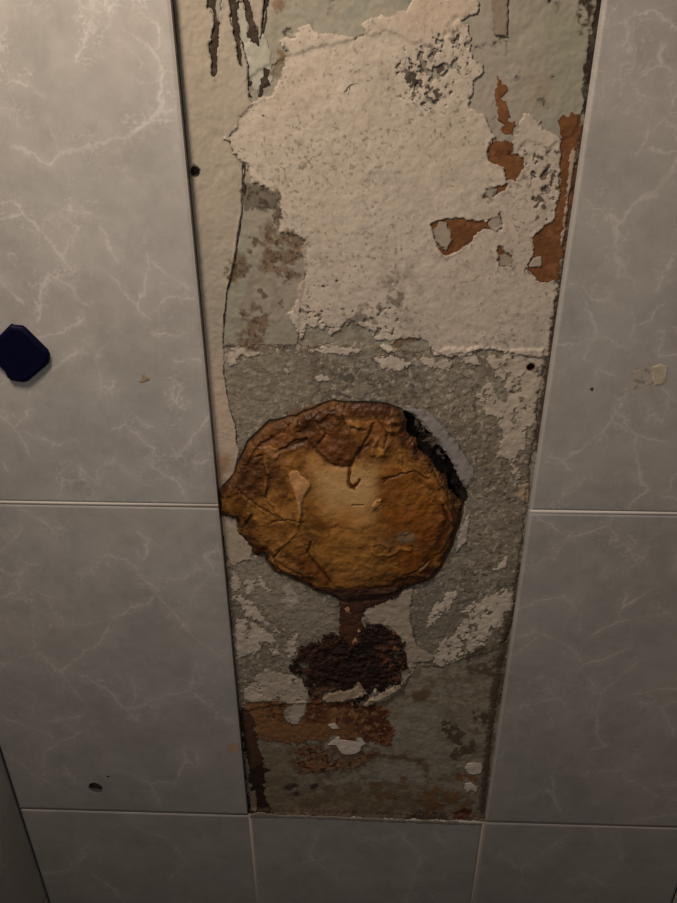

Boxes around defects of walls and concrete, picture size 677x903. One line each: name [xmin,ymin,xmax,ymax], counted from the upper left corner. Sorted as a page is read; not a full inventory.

peeling [173,0,597,489]
peeling [289,471,310,515]
peeling [221,516,299,658]
corrosion [243,695,396,774]
peeling [243,589,507,814]